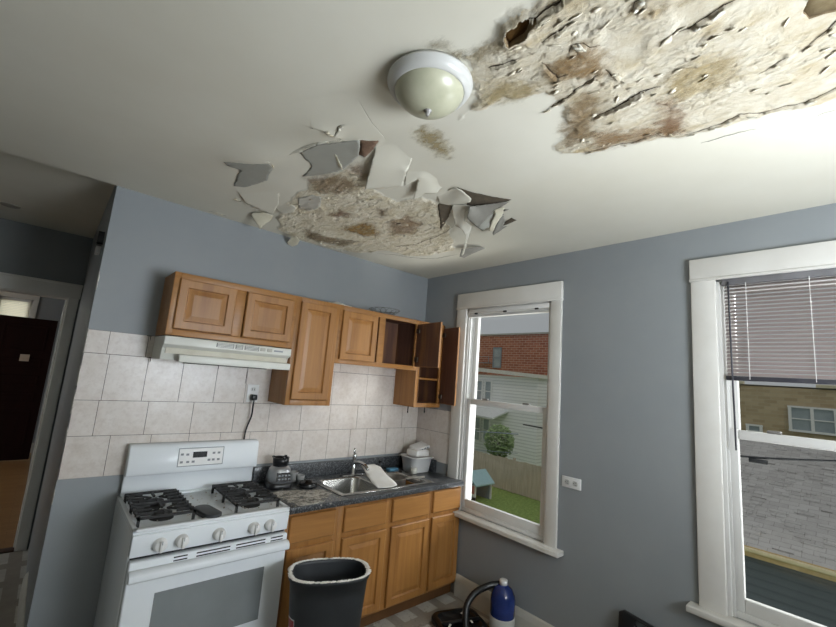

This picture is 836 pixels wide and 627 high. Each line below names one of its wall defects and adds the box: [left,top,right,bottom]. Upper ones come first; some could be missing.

flaking render [183,0,836,259]